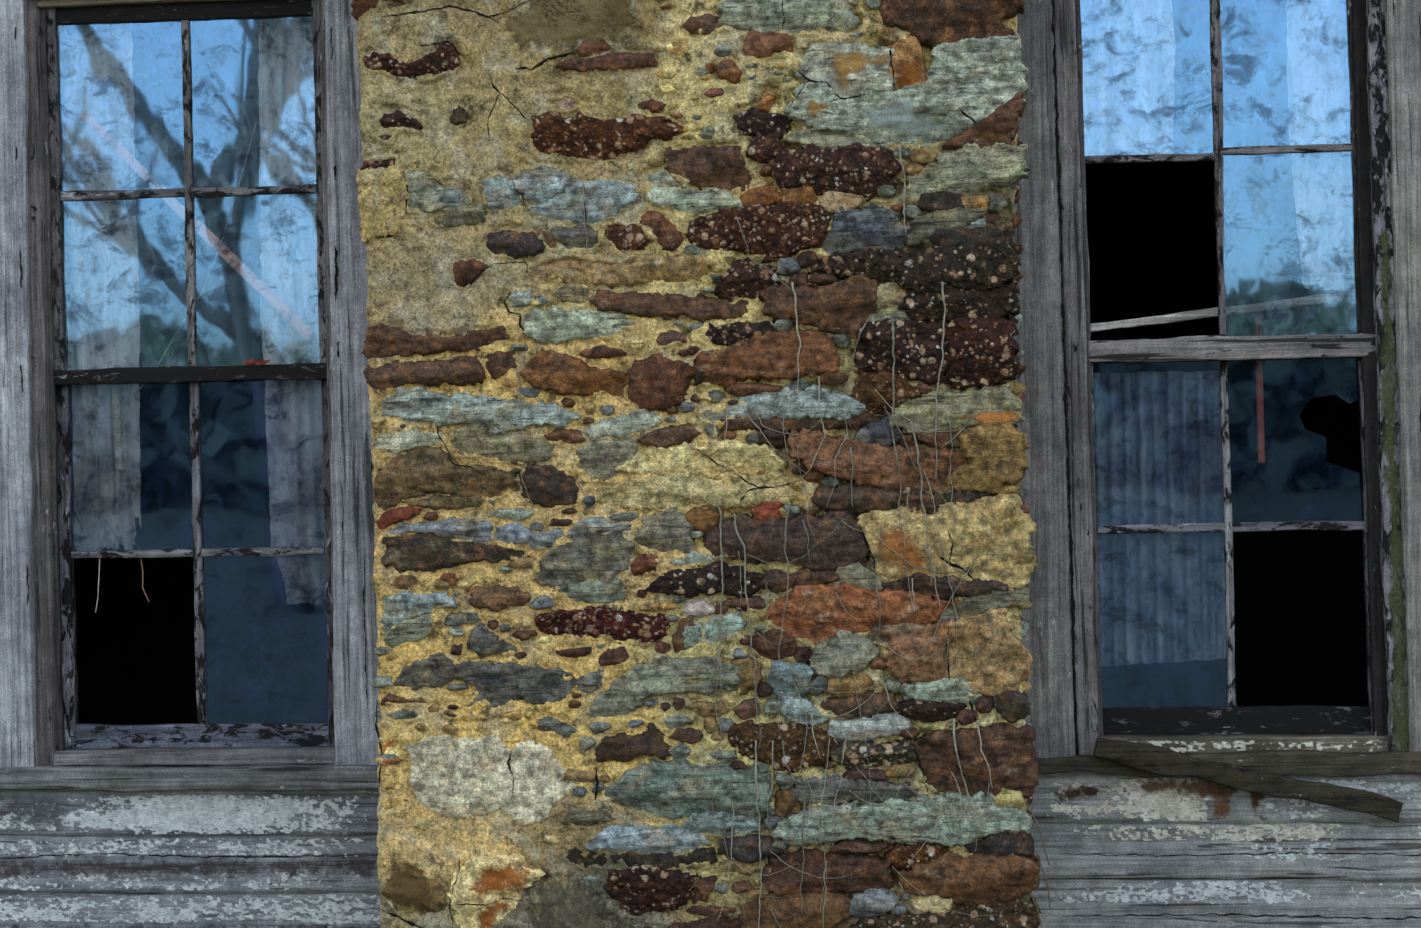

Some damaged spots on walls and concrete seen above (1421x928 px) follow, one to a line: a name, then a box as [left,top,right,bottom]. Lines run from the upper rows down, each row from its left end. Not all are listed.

crack [382,1,527,55]
crack [488,52,571,139]
peeling [1314,779,1421,802]
peeling [1047,778,1346,861]
peeling [0,794,381,928]
peeling [1053,881,1311,904]
peeling [1348,883,1421,898]